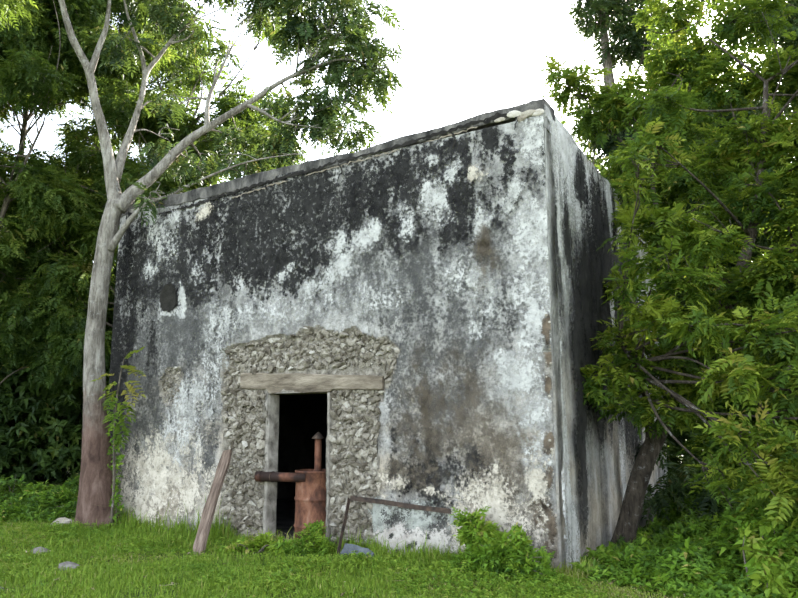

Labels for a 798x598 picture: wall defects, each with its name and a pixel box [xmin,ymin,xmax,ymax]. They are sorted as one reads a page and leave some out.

flaking render [115,174,557,560]
water stain [107,124,645,570]
peeling [398,155,462,242]
peeling [520,114,613,305]